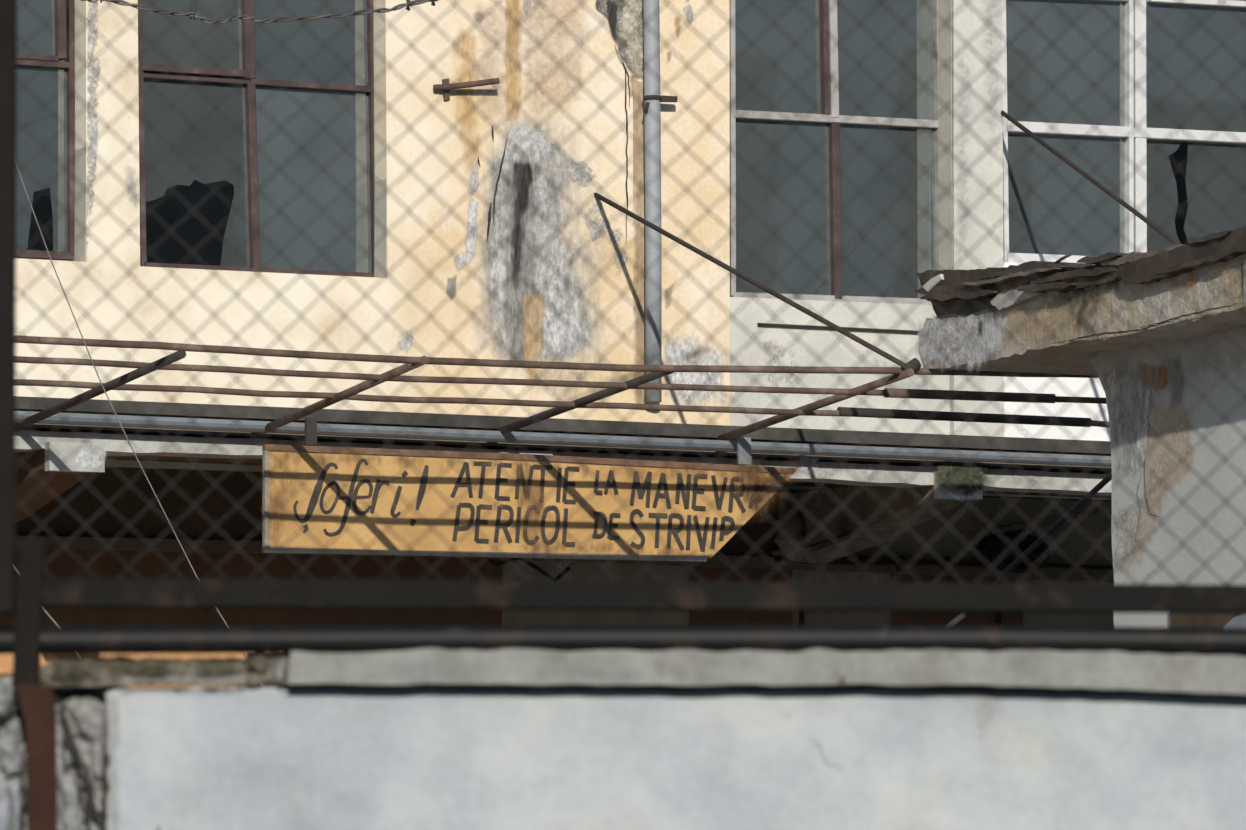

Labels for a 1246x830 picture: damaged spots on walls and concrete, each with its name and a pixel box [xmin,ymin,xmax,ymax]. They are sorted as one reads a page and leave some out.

flaking render [596,0,644,76]
crack [478,125,507,242]
leakage [482,0,594,361]
peeling [548,145,592,186]
peeling [587,203,627,268]
peeling [922,274,944,292]
peeling [541,307,588,357]
peeling [916,303,1058,367]
peeling [1104,366,1192,559]
spalling [0,679,27,830]
spalling [57,692,109,830]